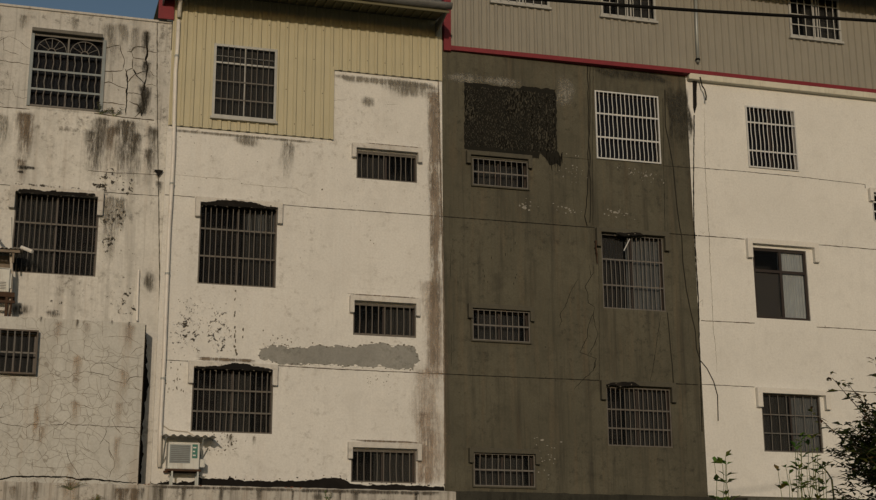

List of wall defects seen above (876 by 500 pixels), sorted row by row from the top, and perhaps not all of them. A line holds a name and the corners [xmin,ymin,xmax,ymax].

damp [0,114,32,150]
damp [93,168,133,252]
damp [86,118,161,187]
damp [137,86,150,114]
crack [88,23,595,312]
damp [338,75,441,365]
spalling [178,290,420,384]
crack [0,322,143,483]